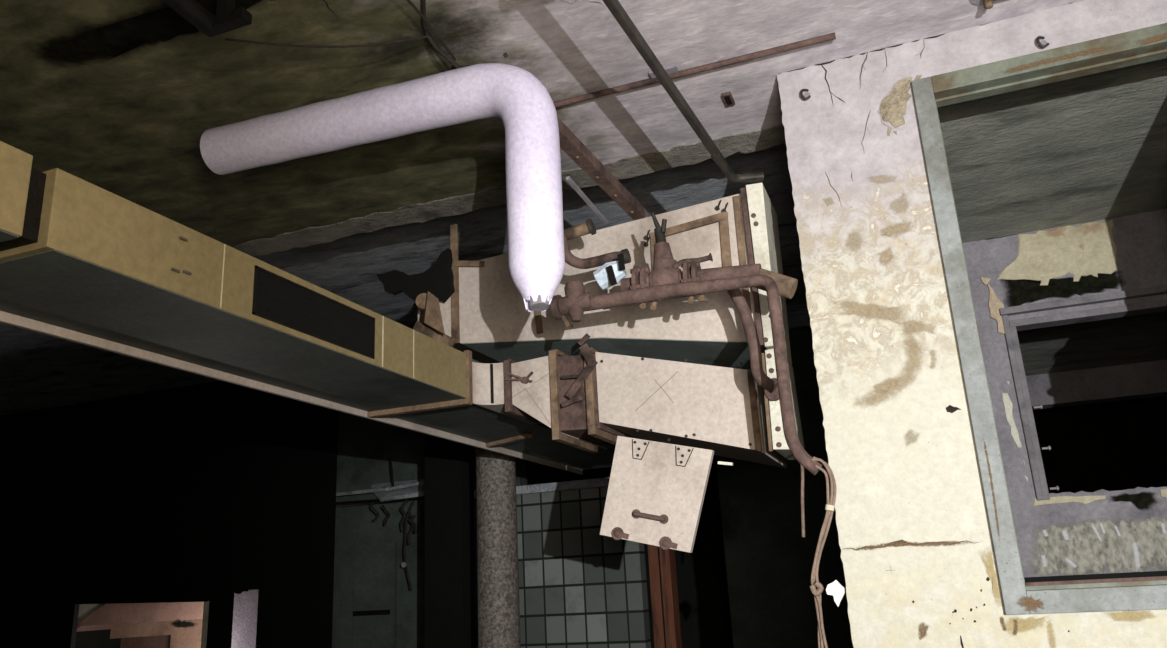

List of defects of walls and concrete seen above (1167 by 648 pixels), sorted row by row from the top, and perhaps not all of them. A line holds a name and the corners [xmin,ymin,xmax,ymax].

crack [779,33,946,203]
spalling [877,75,922,136]
corrosion [1007,47,1110,73]
peeling [980,219,1121,334]
water stain [842,302,935,404]
crack [845,540,982,575]